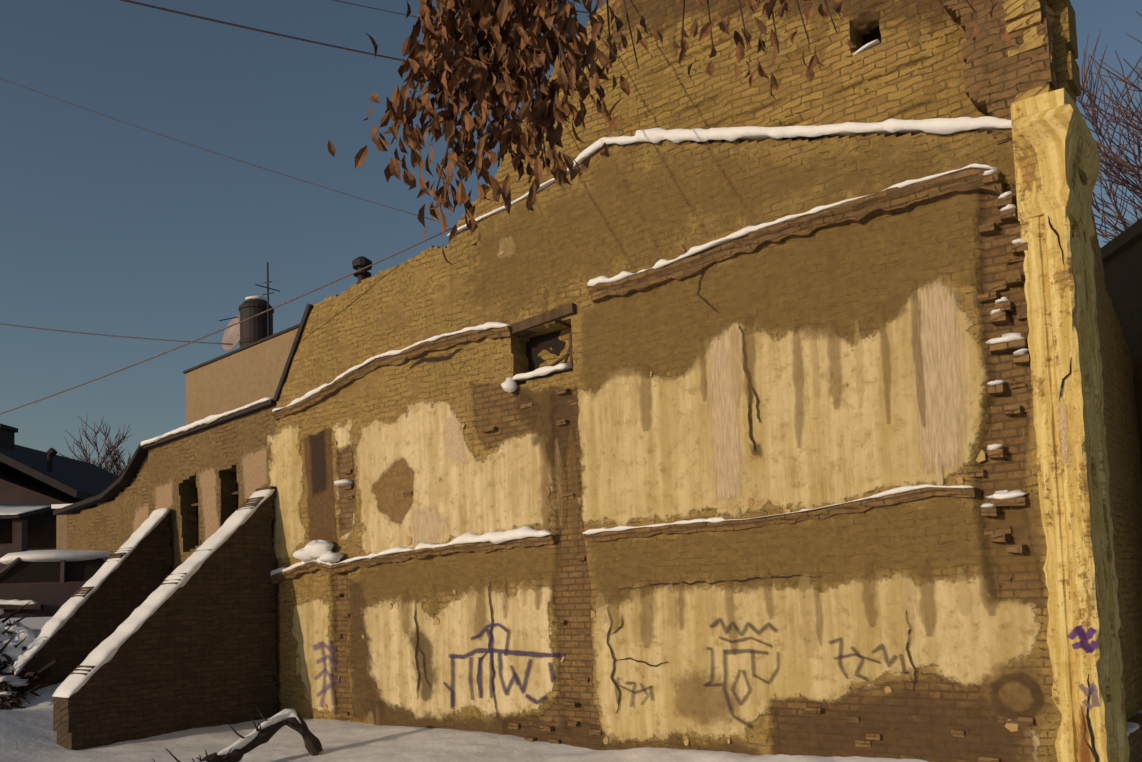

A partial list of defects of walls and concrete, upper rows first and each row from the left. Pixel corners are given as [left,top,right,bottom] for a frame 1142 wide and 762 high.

crack [681,245,761,455]
flaking render [291,186,1045,762]
crack [414,601,432,699]
crack [606,575,821,713]
crack [1081,674,1099,762]